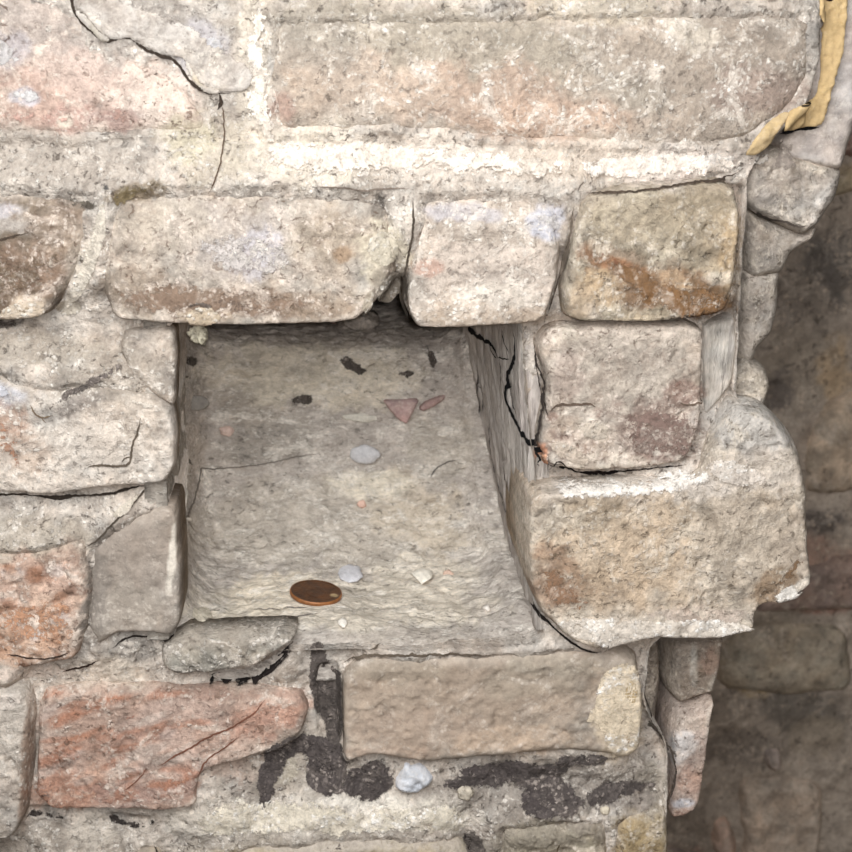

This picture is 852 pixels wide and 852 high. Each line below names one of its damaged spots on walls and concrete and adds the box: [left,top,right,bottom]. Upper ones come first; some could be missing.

crack [70,0,226,192]
crack [0,485,144,548]
crack [87,418,141,468]
crack [476,373,508,512]
crack [468,326,686,476]
crack [252,606,317,617]
crack [123,642,293,791]
damp [197,641,485,852]
damp [443,663,677,822]